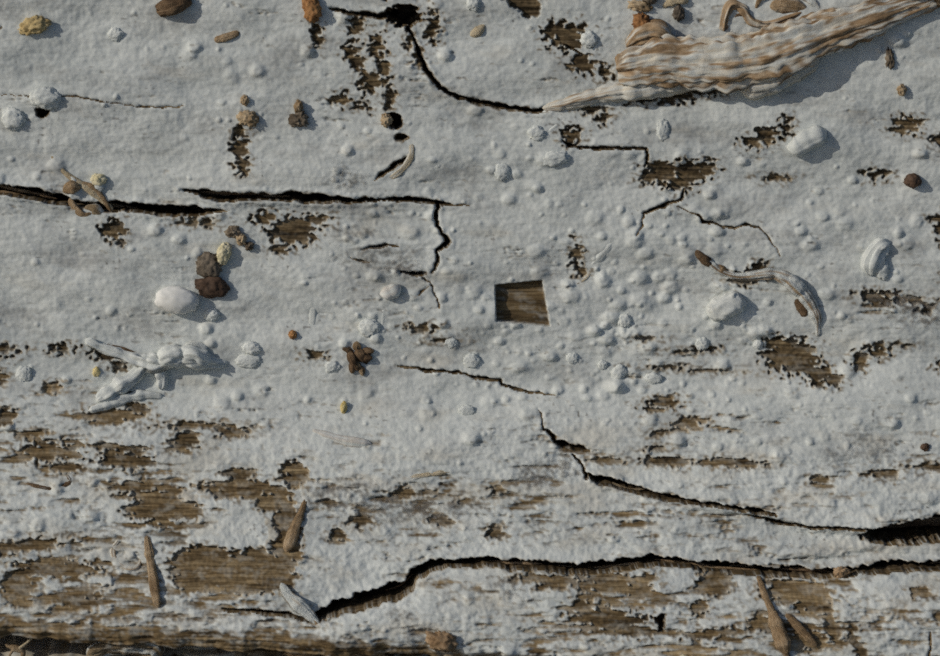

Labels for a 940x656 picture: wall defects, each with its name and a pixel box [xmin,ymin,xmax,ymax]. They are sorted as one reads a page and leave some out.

peeling [327,15,399,116]
crack [328,0,544,114]
peeling [502,0,616,82]
crack [562,140,649,165]
crack [0,156,470,309]
crack [636,188,781,257]
peeling [757,332,915,391]
crack [397,365,870,532]
peeling [585,393,771,470]
peeling [0,402,320,625]
crack [222,553,940,623]
peeling [509,571,869,656]